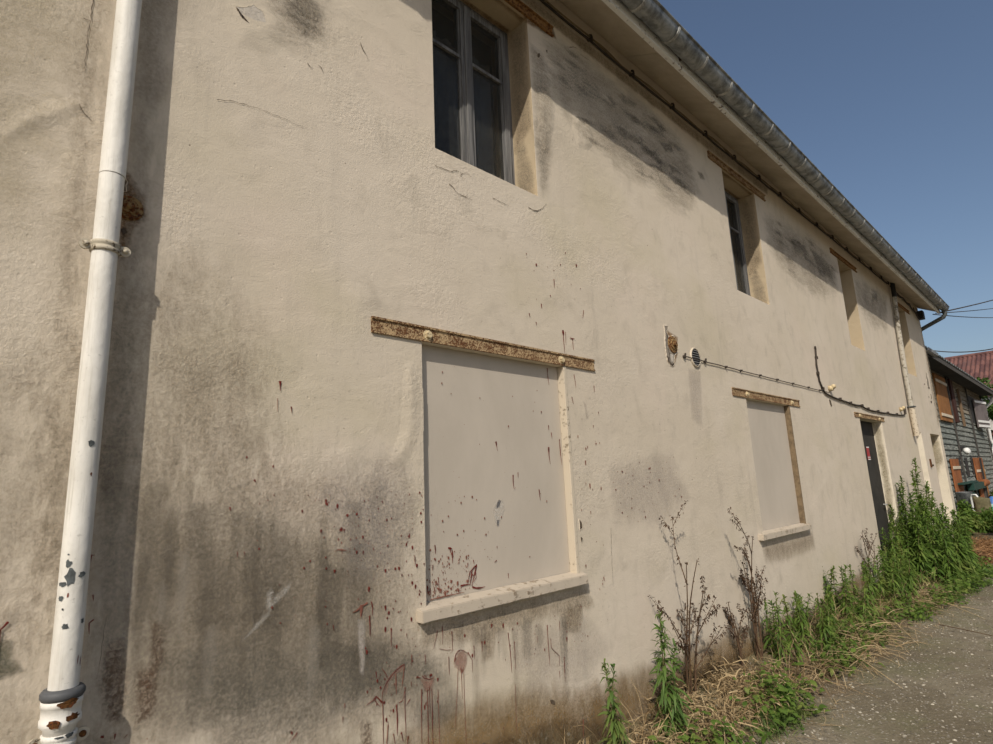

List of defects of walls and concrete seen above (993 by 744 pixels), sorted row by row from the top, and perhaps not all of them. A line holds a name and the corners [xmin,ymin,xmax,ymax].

crack [84,0,96,71]
peeling [236,5,266,23]
peeling [58,554,86,611]
damp [0,643,16,677]